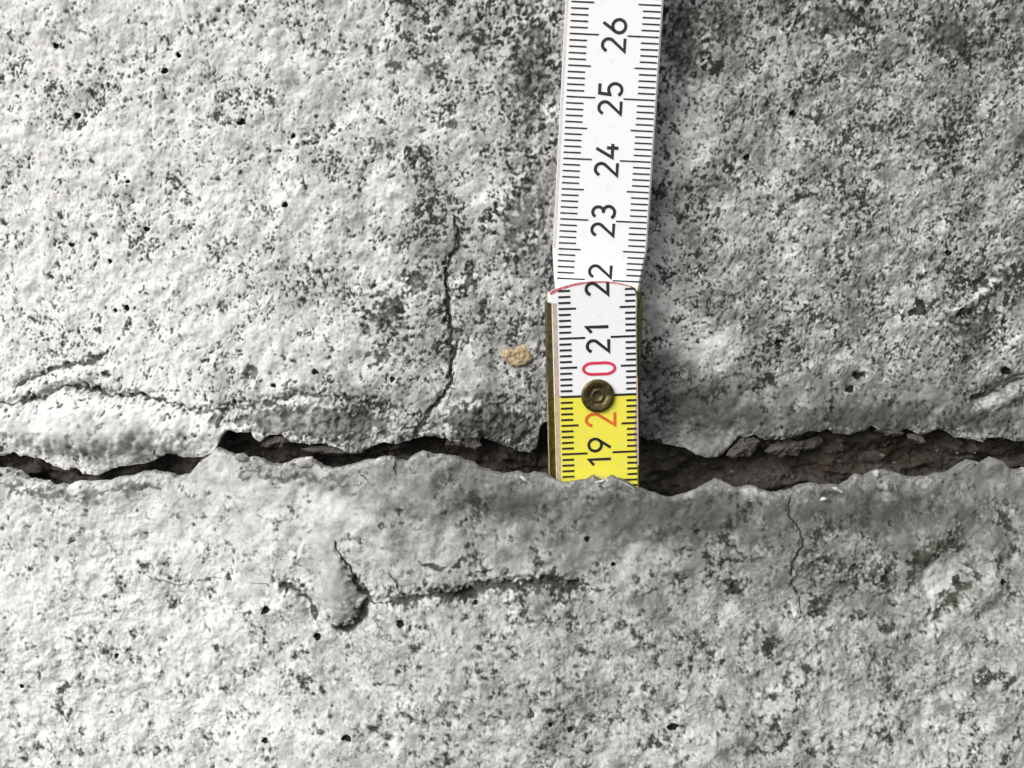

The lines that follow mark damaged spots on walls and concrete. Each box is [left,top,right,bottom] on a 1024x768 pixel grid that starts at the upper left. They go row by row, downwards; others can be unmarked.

crack [0,214,548,485]
crack [640,425,1024,614]